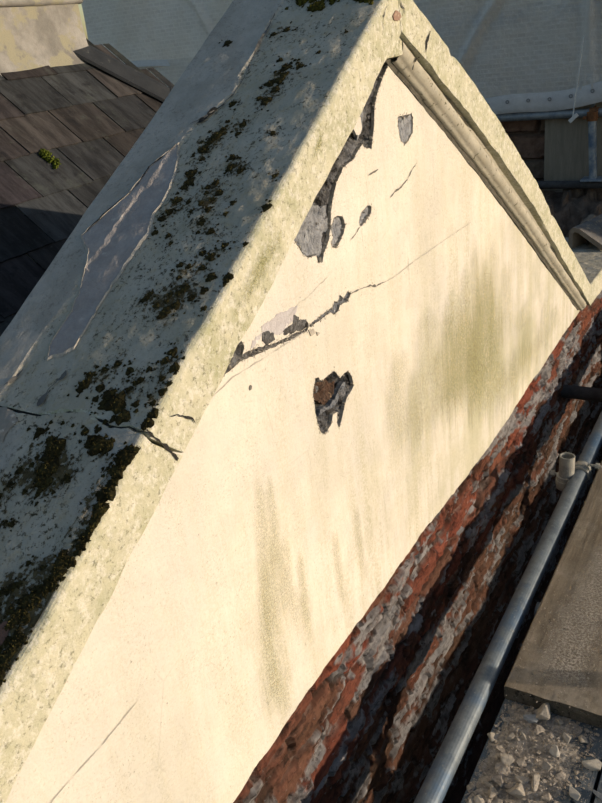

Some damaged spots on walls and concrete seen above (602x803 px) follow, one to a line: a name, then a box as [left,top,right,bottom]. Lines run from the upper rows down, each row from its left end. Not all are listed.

flaking render [294,58,391,265]
peeling [397,113,413,146]
peeling [47,143,180,361]
crack [219,222,471,391]
crack [0,369,71,416]
spalling [312,367,354,435]
crack [97,418,179,461]